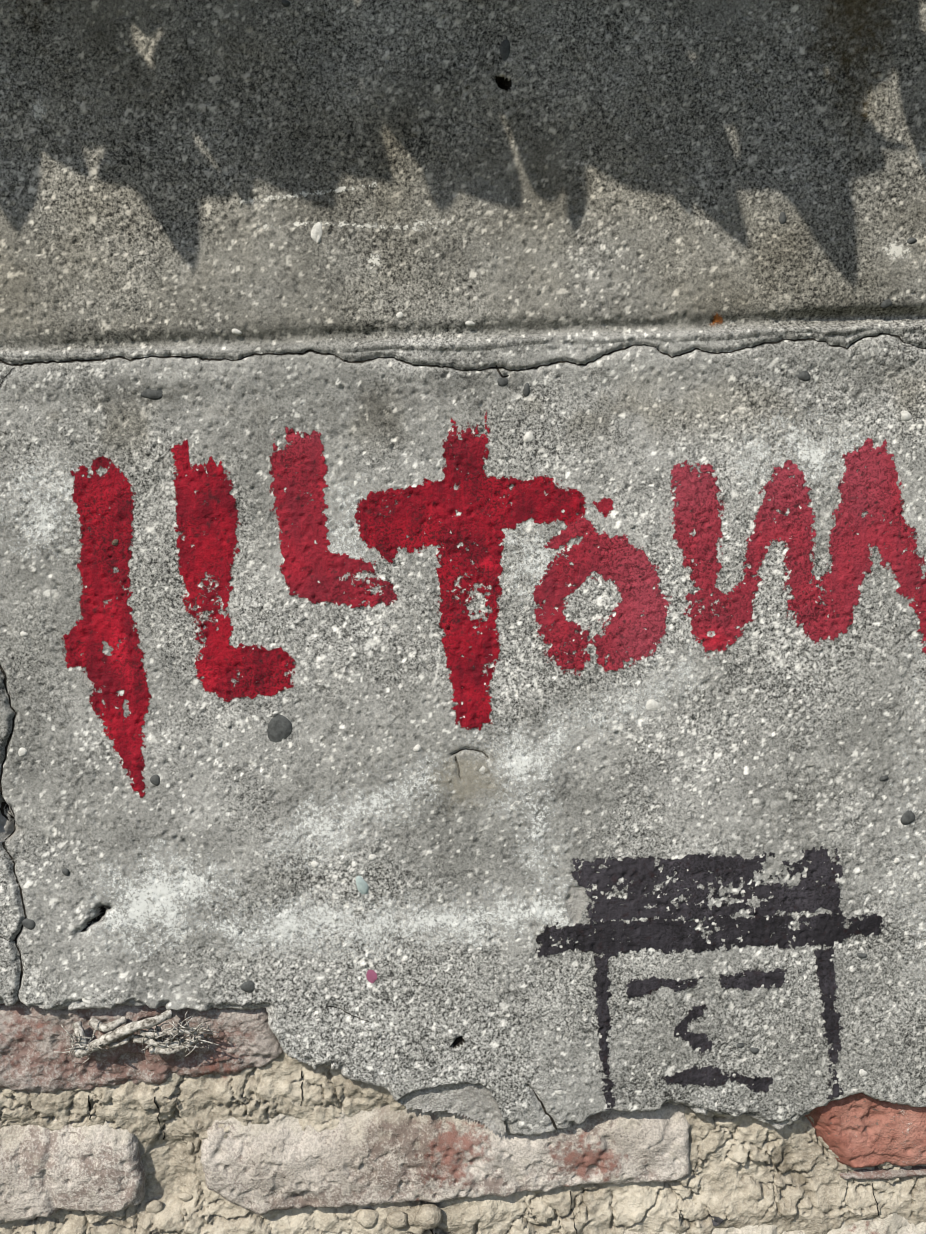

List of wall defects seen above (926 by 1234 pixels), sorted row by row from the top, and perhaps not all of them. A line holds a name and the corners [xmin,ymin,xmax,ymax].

crack [0,333,926,385]
peeling [394,1082,506,1187]
peeling [552,1133,628,1181]